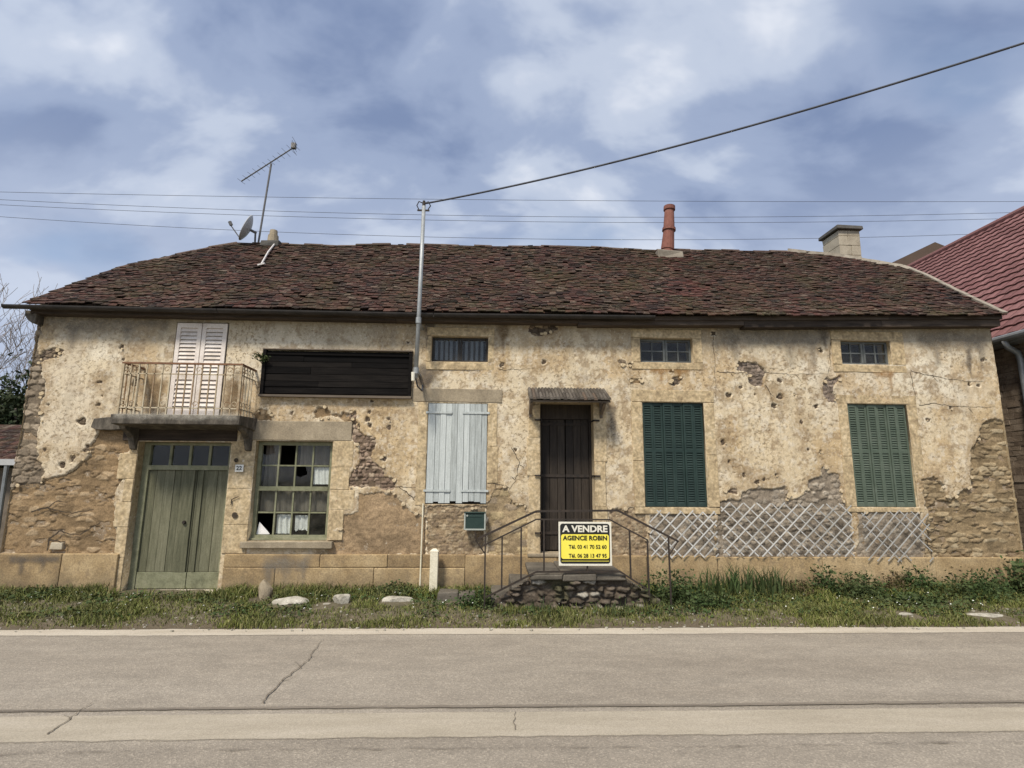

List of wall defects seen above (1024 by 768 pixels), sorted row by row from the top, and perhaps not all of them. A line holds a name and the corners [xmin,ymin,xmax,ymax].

flaking render [37,348,64,364]
flaking render [726,358,765,397]
flaking render [814,376,842,409]
crack [910,371,996,413]
peeling [315,400,428,554]